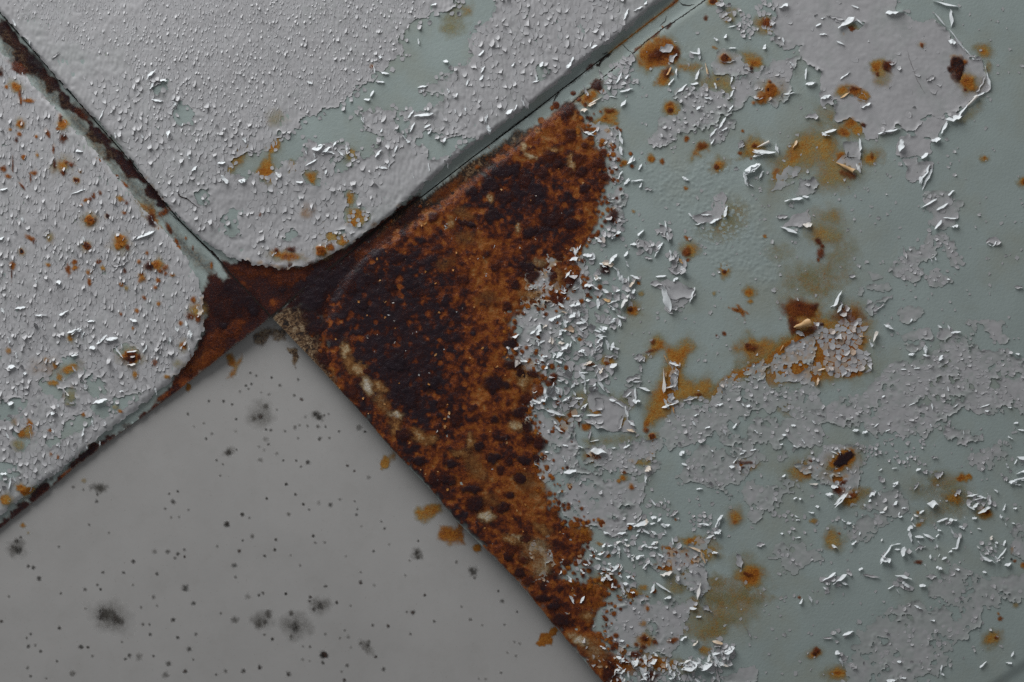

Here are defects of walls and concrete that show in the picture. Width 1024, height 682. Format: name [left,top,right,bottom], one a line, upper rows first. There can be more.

peeling [147,69,194,138]
peeling [217,0,496,183]
rust [616,0,763,93]
rust [947,56,978,92]
rust [772,114,879,186]
peeling [67,320,147,366]
rust [0,19,684,682]
rust [636,211,870,466]
peeling [506,0,1024,682]
peeling [0,388,28,438]
peeling [47,374,139,449]
rust [826,448,869,505]